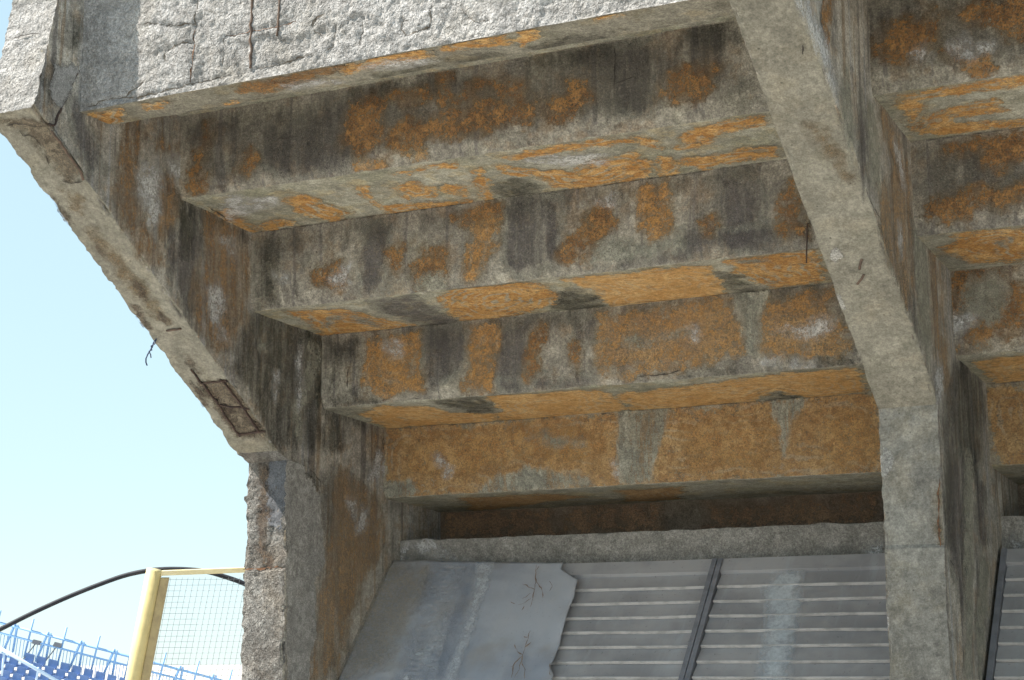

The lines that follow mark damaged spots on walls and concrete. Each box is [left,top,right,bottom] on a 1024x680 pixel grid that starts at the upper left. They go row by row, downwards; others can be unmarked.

crack [89,0,336,107]
damp [193,60,508,181]
corrosion [222,29,544,106]
damp [525,23,726,121]
efflorescence [137,165,180,223]
efflorescence [208,286,226,338]
damp [167,196,277,316]
corrosion [215,193,354,233]
damp [492,179,564,281]
corrosion [285,71,881,539]
corrosion [870,0,1024,465]
spalling [184,356,266,439]